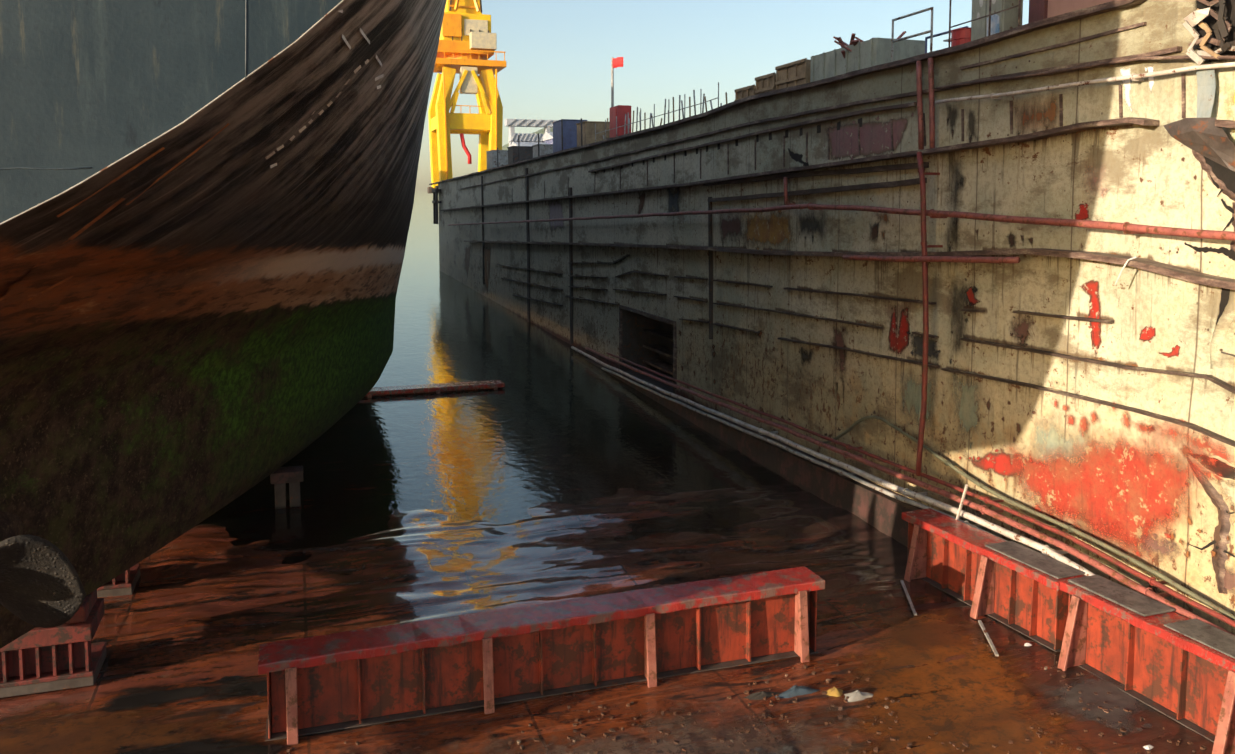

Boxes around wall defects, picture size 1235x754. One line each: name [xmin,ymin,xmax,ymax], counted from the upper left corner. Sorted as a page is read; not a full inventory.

peeling [888,306,910,356]
peeling [950,278,980,364]
peeling [1139,326,1180,358]
crack [1185,150,1235,370]
peeling [959,420,1235,556]
crack [1186,456,1235,594]
corrosion [0,702,251,754]
corrosion [824,596,1068,754]